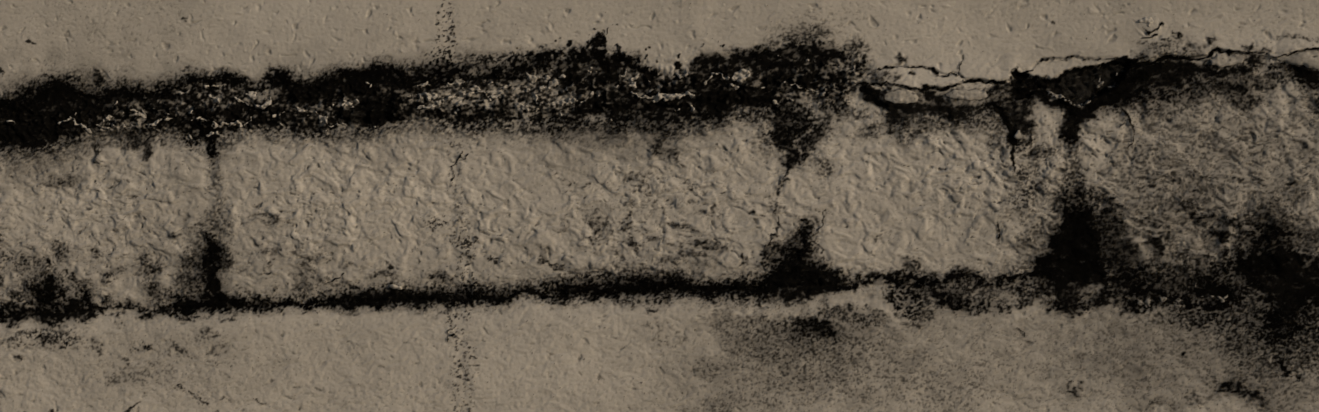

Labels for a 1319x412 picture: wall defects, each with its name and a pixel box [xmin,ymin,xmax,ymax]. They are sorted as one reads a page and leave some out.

water stain [0,3,1056,202]
crack [853,46,1319,91]
crack [1119,109,1135,148]
water stain [1091,32,1319,117]
water stain [0,104,1319,412]